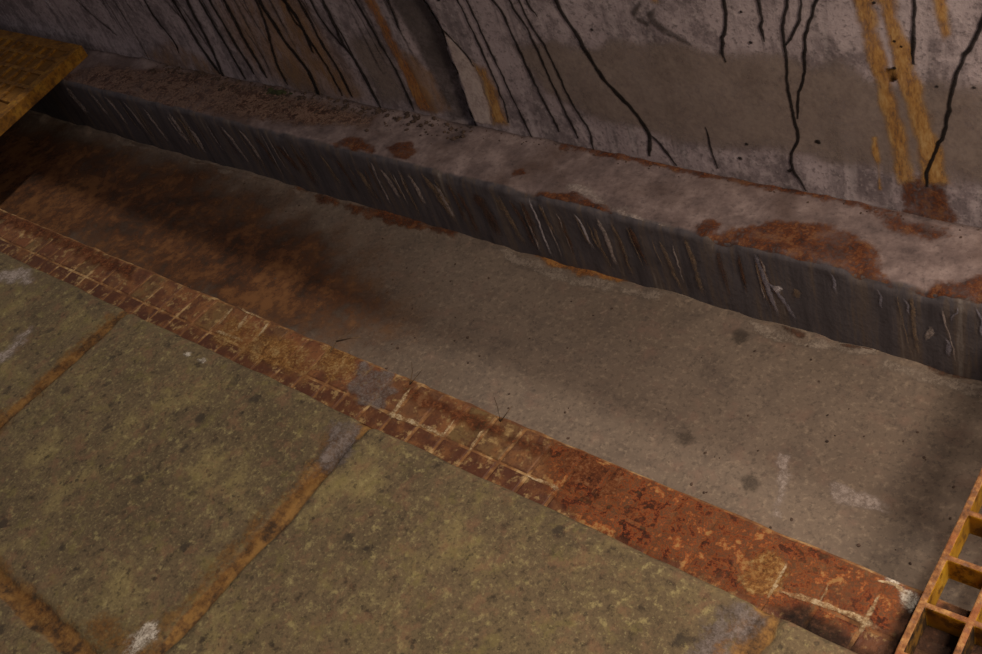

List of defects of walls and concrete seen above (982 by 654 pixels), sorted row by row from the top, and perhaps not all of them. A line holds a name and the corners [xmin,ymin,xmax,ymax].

rust [366,0,441,110]
crack [423,0,476,126]
rust [559,0,956,240]
rust [0,127,380,372]
rust [537,255,623,282]
rust [696,219,891,288]
rust [927,275,982,303]
rust [404,386,906,633]